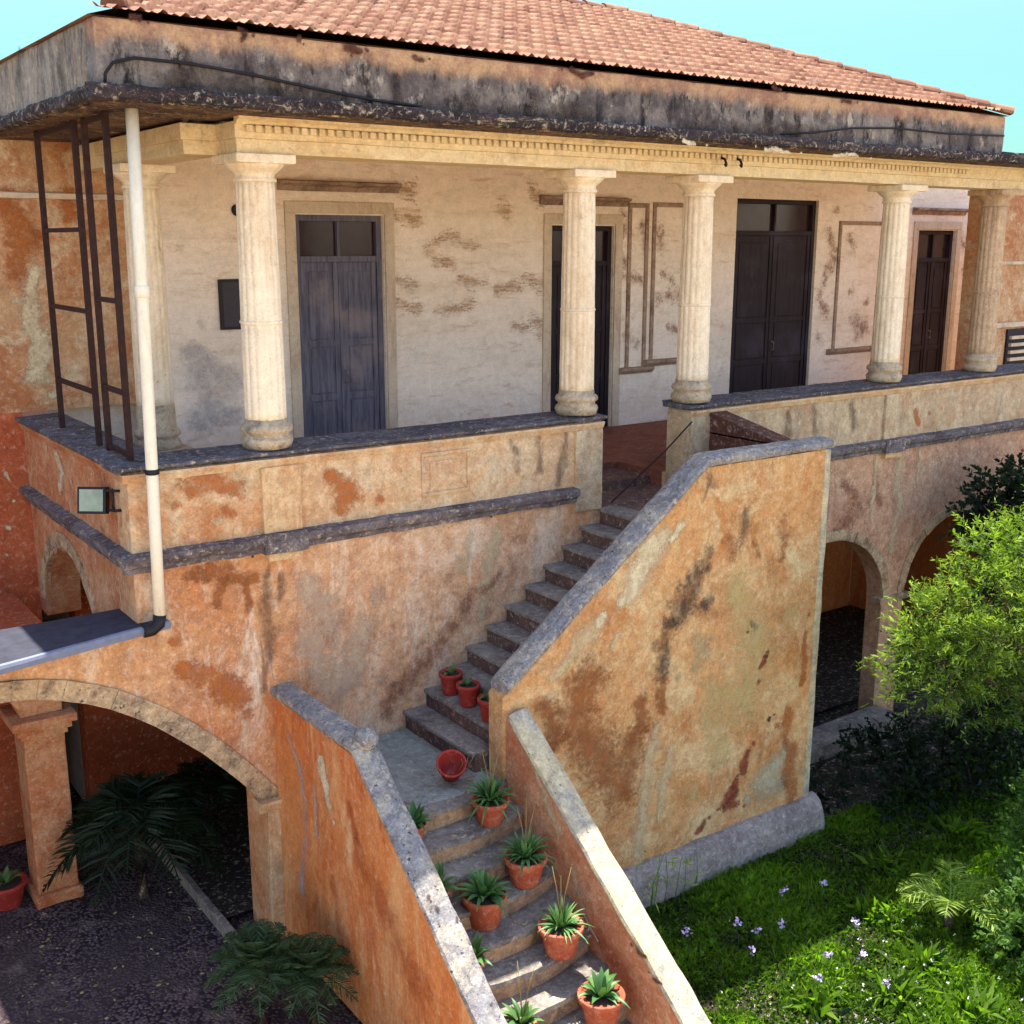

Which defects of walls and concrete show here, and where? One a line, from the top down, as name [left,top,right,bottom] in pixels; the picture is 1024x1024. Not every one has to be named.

peeling [434,258,542,314]
peeling [172,473,245,517]
leakage [185,562,259,612]
leakage [536,565,714,865]